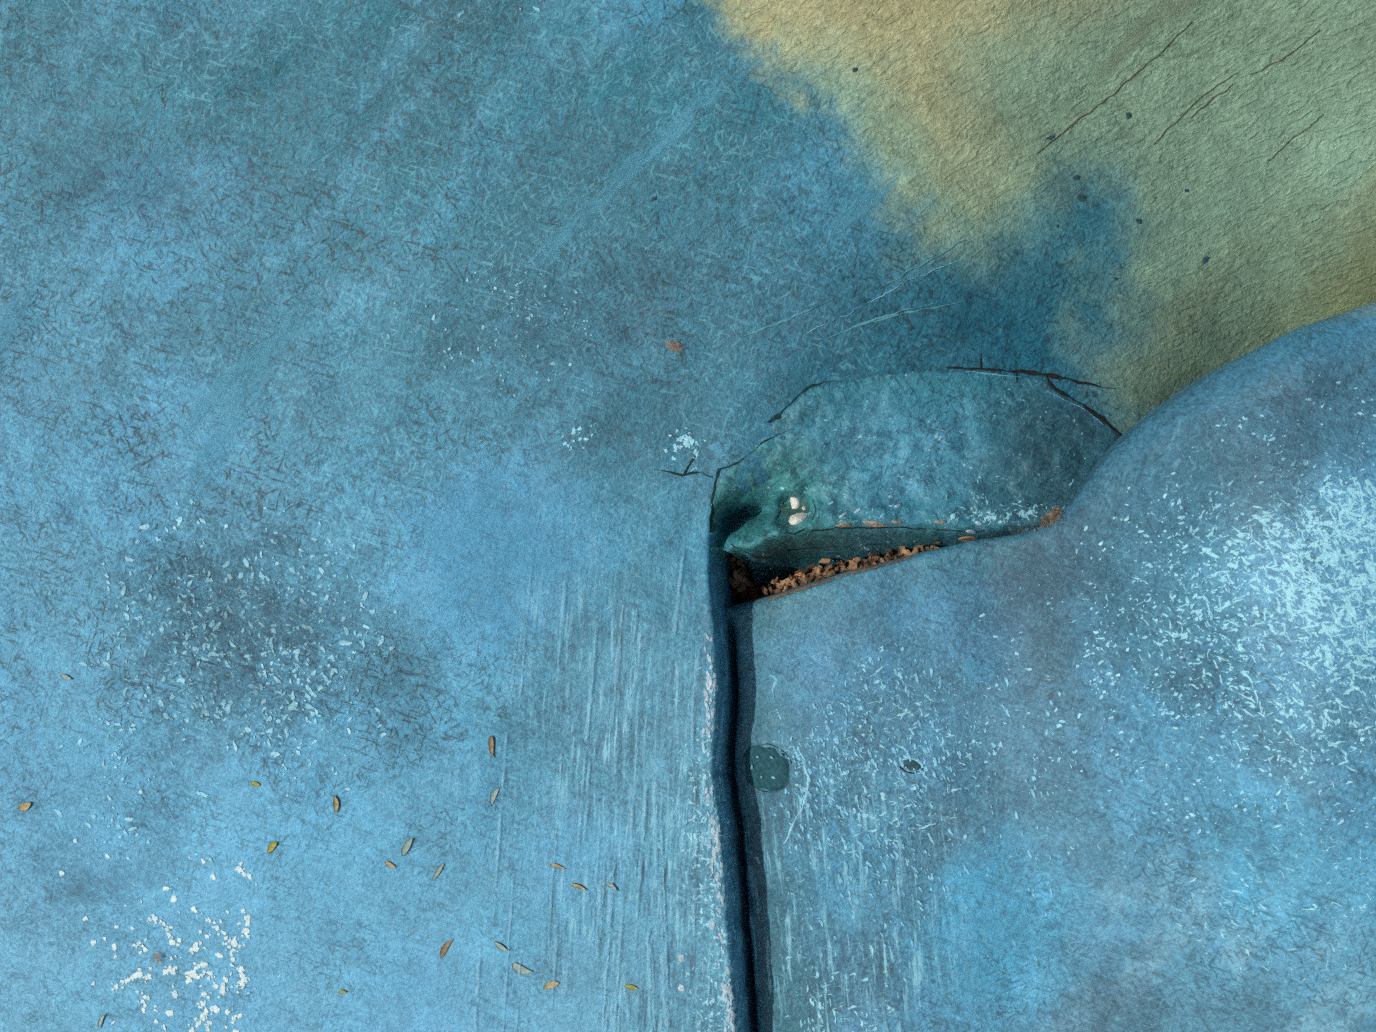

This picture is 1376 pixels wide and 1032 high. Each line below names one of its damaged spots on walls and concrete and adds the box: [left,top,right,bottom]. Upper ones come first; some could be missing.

crack [653,381,841,533]
crack [947,353,1122,437]